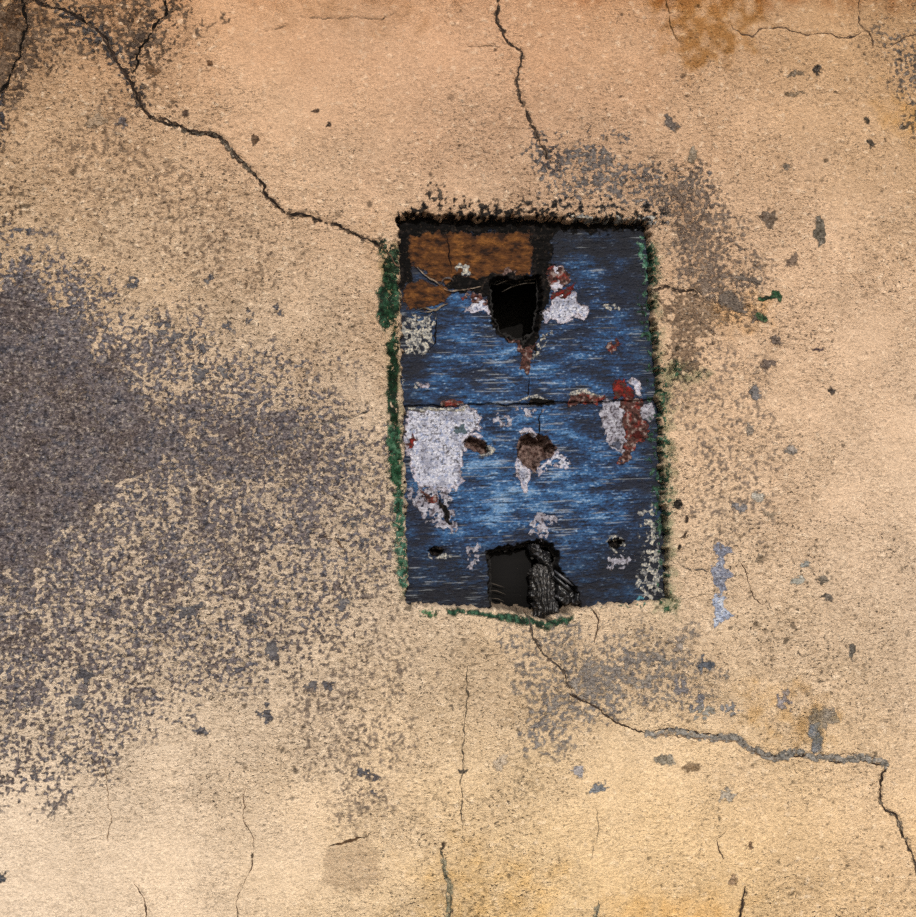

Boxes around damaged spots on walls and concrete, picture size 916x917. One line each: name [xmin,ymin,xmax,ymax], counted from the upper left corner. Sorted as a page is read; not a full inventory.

flaking render [60,106,128,223]
crack [0,0,400,268]
crack [469,0,552,163]
flaking render [664,113,681,132]
peeling [520,126,798,628]
peeling [0,207,589,823]
crack [328,832,370,847]
crack [440,842,453,917]
flaking render [589,782,609,793]
flaking render [654,754,702,773]
crack [523,610,916,870]
crack [739,886,748,917]